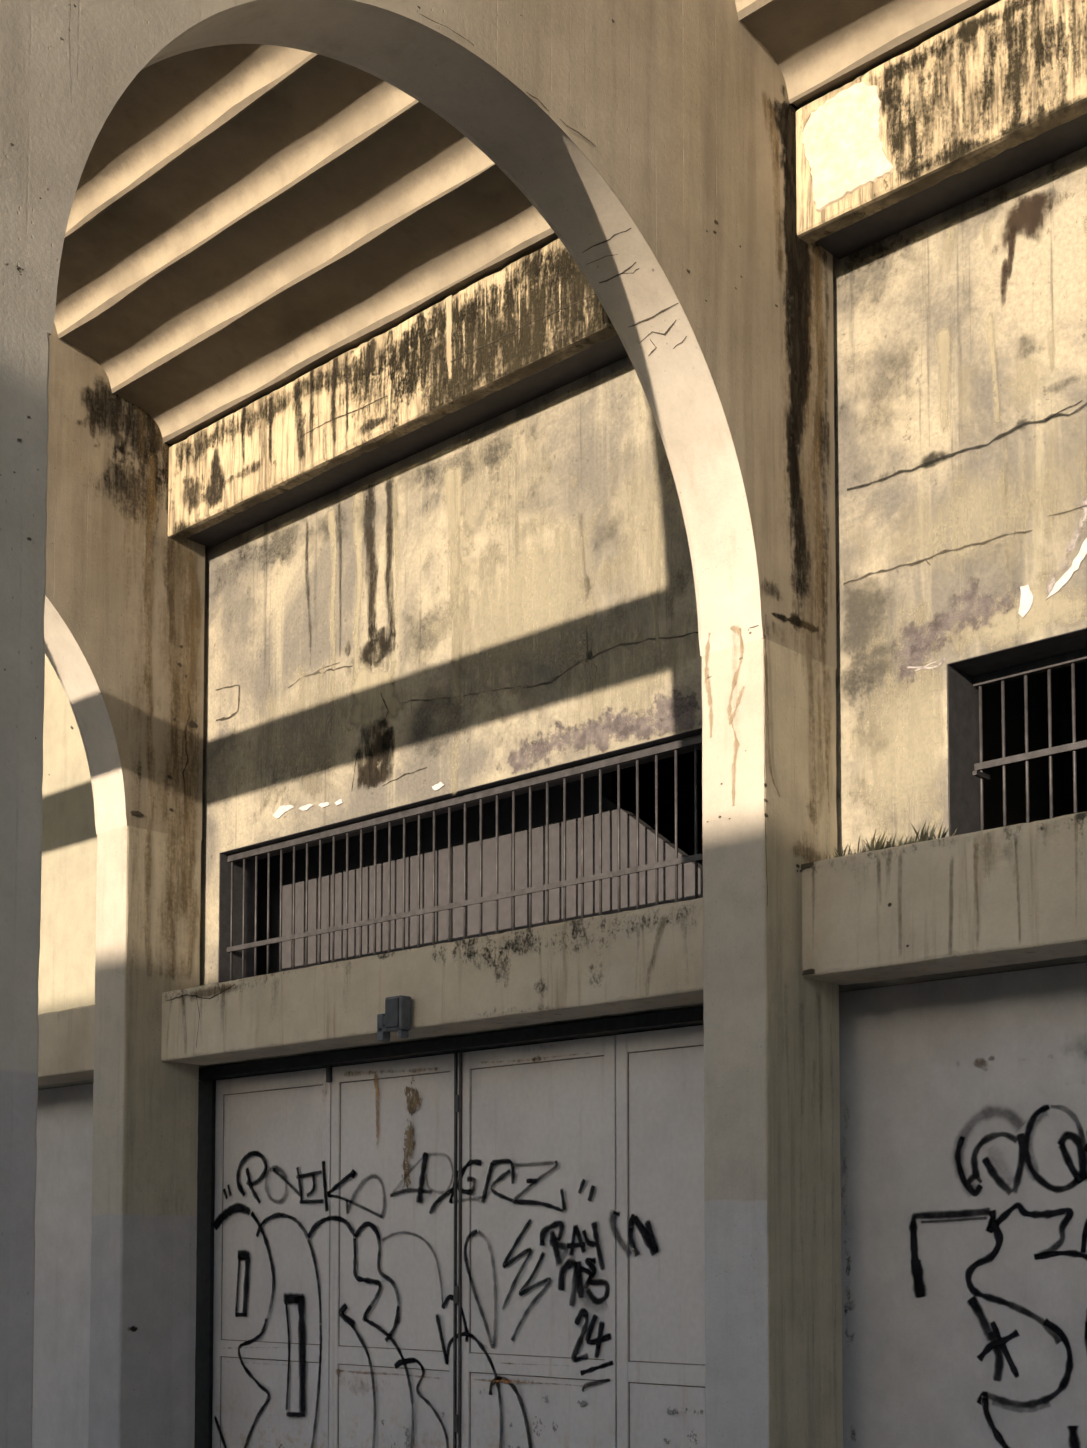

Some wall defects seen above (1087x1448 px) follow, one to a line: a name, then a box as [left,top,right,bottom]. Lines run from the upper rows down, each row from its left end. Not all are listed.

leakage [876,0,1087,180]
crack [450,228,639,362]
crack [630,303,687,356]
leakage [986,193,1052,302]
crack [300,395,388,437]
leakage [763,86,829,797]
crack [847,400,1087,491]
leakage [78,249,612,979]
leakage [244,435,690,806]
crack [403,632,699,703]
spalling [893,499,1087,682]
leakage [919,575,1086,653]